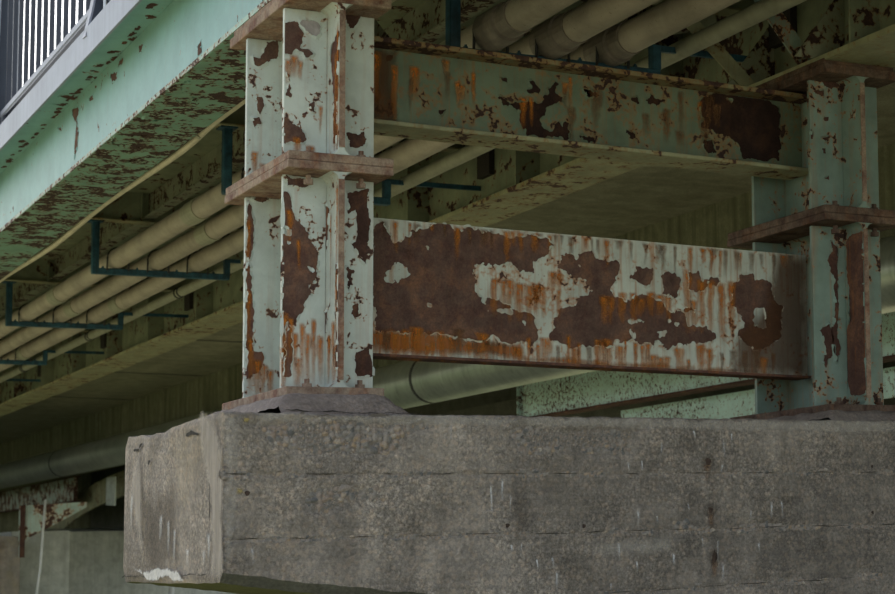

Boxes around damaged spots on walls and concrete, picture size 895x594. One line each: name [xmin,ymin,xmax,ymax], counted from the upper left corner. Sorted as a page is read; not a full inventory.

peeling [1,3,158,168]
corrosion [498,77,601,143]
corrosion [631,93,669,126]
corrosion [698,92,782,162]
corrosion [243,174,806,386]
corrosion [820,230,867,398]